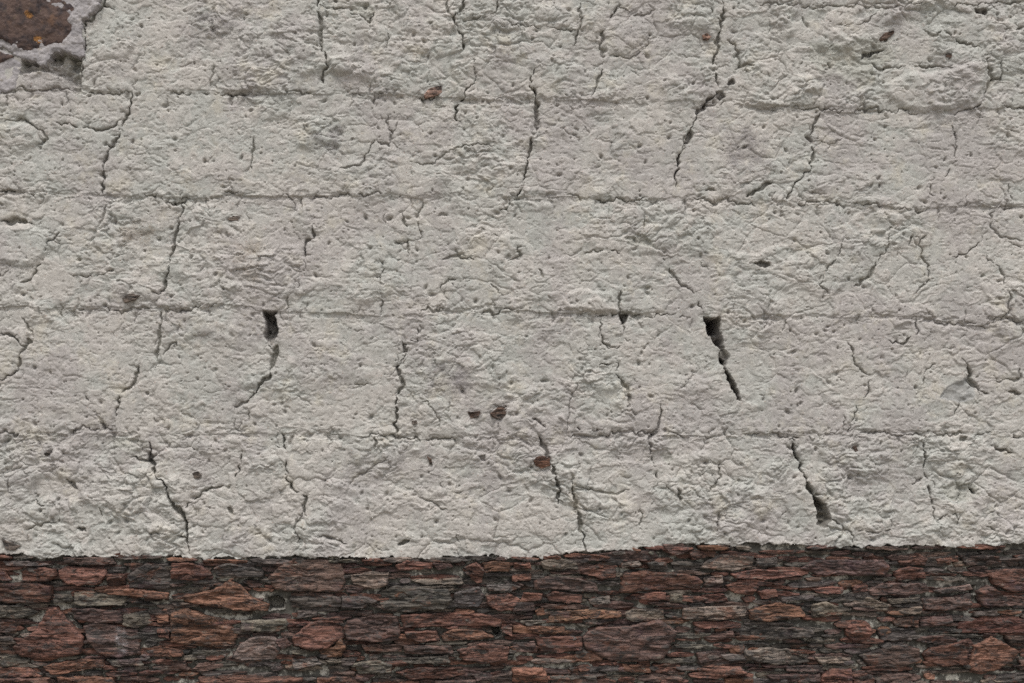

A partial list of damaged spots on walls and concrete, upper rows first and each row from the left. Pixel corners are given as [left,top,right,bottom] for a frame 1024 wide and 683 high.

peeling [0,0,102,95]
crack [481,227,544,317]
crack [501,69,558,210]
crack [417,0,655,166]
crack [567,194,656,231]
crack [674,8,1024,290]
crack [889,184,1021,345]
crack [234,346,279,421]
crack [349,254,474,486]
crack [533,259,821,550]
crack [26,500,103,531]
crack [137,443,242,551]